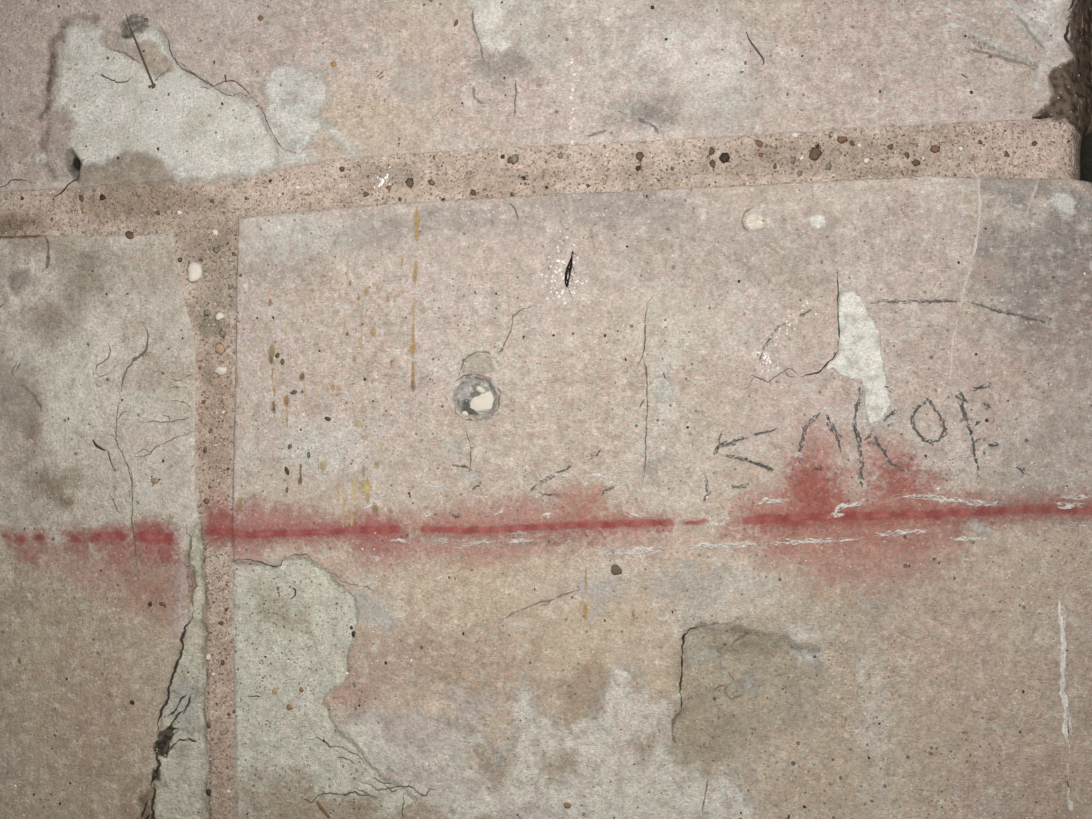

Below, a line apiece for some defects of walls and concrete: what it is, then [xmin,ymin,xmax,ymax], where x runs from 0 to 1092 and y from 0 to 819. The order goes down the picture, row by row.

peeling [51,20,359,198]
peeling [467,0,572,65]
crack [96,325,193,580]
peeling [803,271,893,431]
crack [141,528,198,819]
peeling [231,553,814,819]